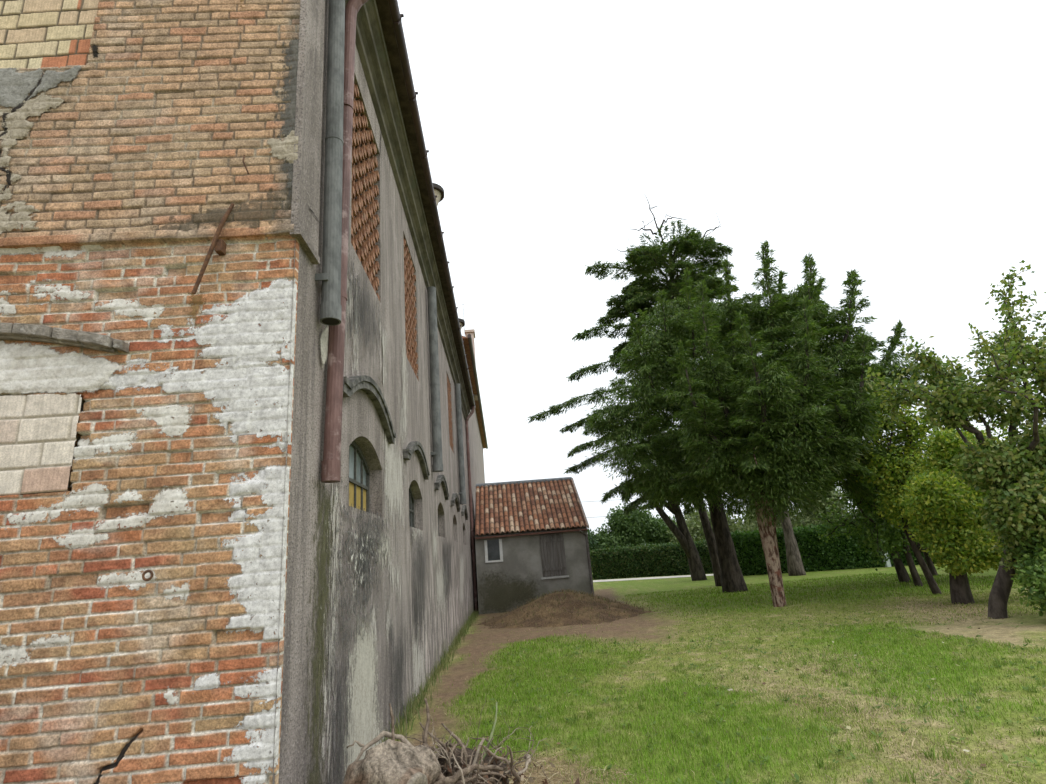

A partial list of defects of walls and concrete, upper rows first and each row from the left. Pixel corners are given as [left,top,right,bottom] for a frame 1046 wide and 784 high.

crack [0,71,44,191]
peeling [0,245,104,265]
peeling [0,270,297,452]
peeling [73,432,138,460]
peeling [6,482,195,549]
peeling [95,568,190,602]
peeling [221,465,290,641]
damp [302,274,468,784]
peeling [0,632,74,667]
crack [94,731,141,784]
peeling [160,688,179,706]
peeling [183,667,282,784]